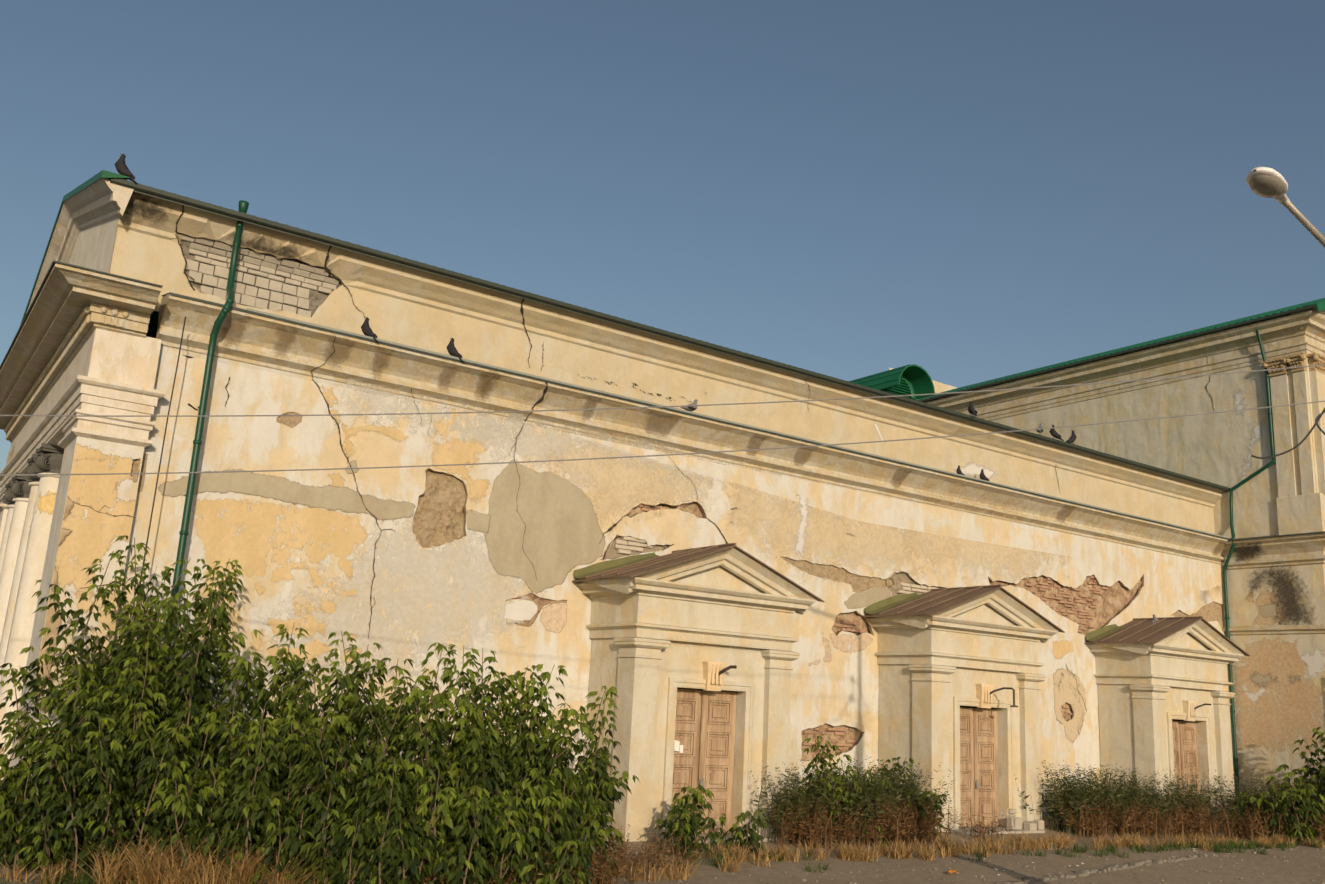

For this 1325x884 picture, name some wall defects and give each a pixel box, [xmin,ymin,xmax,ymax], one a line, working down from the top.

spalling [176,232,342,317]
crack [324,246,366,319]
peeling [0,443,148,754]
crack [311,335,394,639]
spalling [411,408,490,548]
crack [509,299,549,580]
spalling [505,593,567,627]
spalling [603,535,674,560]
spalling [625,501,707,519]
spalling [780,556,946,597]
damp [1234,543,1311,625]
spalling [988,574,1144,744]